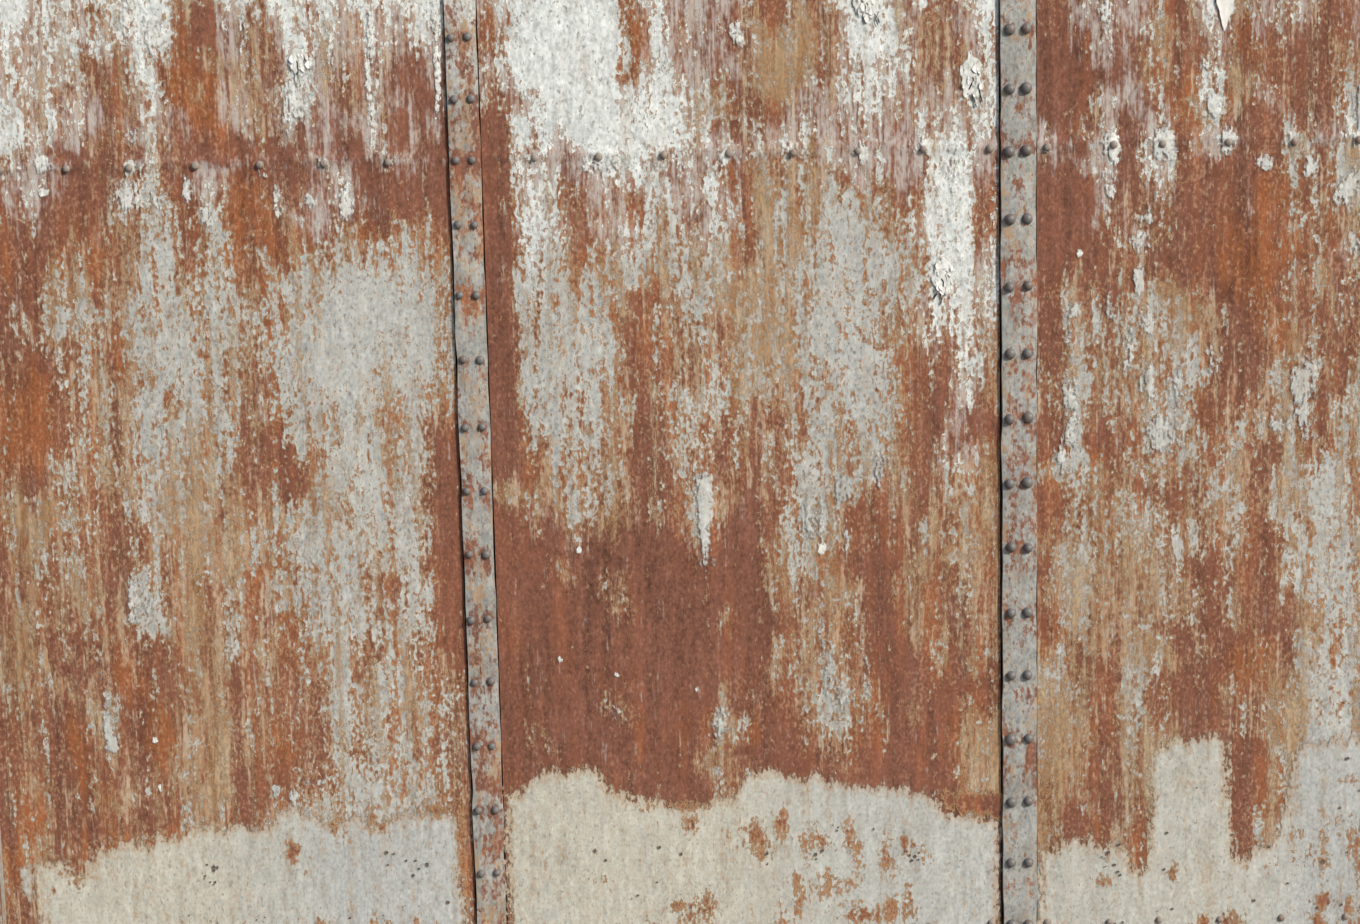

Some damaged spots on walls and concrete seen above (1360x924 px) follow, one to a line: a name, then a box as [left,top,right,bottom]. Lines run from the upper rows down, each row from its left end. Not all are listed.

peeling [725,20,744,47]
peeling [1216,0,1234,31]
peeling [113,129,214,228]
peeling [338,180,355,221]
peeling [1100,128,1122,199]
peeling [1149,122,1178,165]
peeling [1208,90,1238,155]
peeling [1255,152,1273,171]
peeling [1285,131,1319,177]
rust [0,0,476,924]
rust [476,0,1003,924]
rust [1037,0,1360,924]